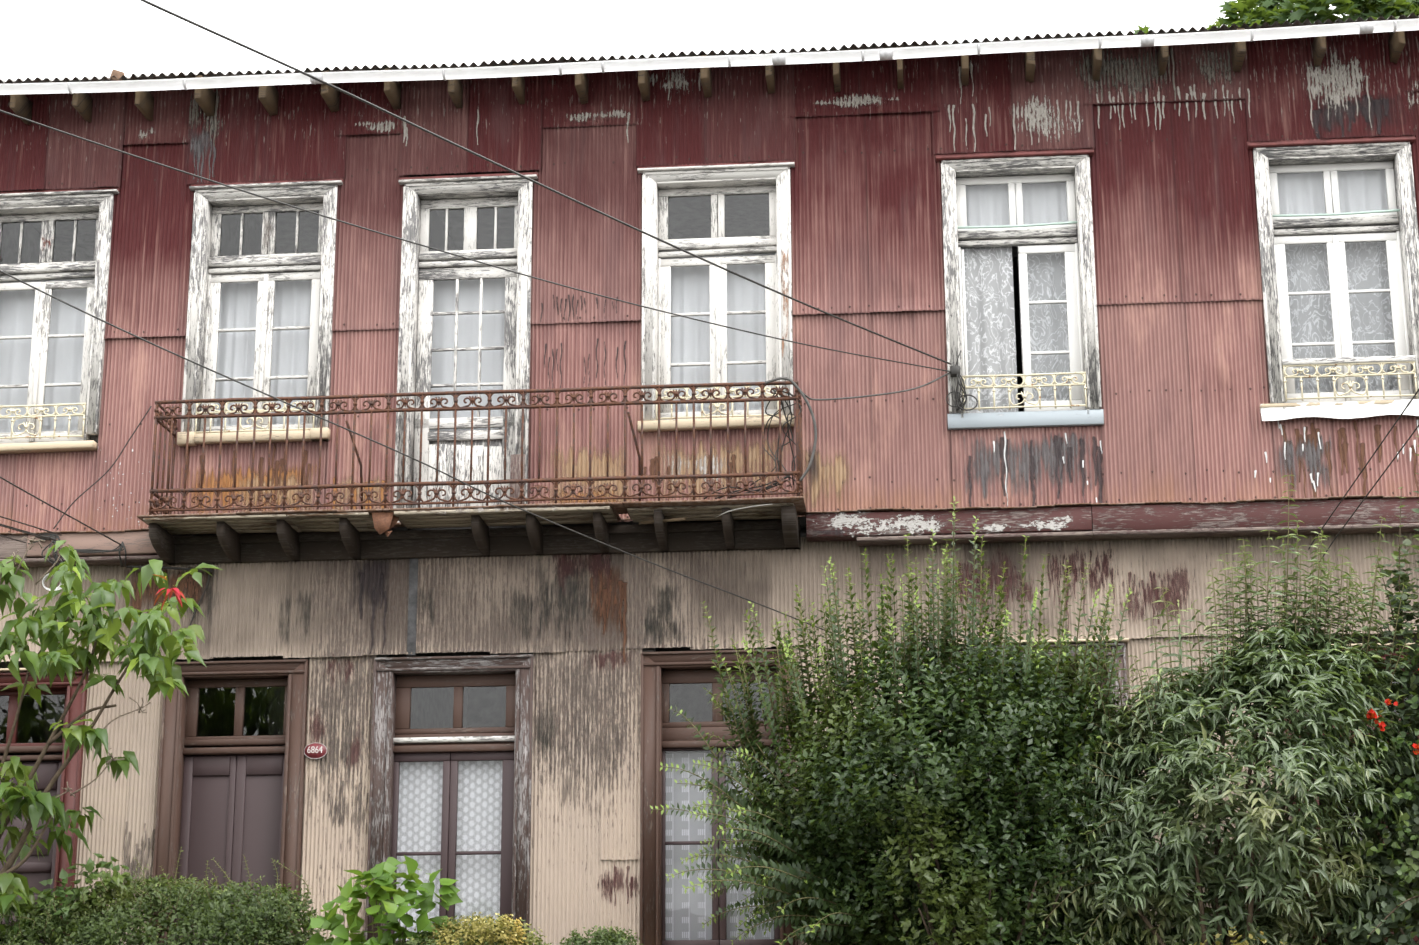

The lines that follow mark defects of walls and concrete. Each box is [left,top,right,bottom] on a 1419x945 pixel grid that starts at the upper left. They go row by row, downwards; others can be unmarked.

peeling [948,60,991,152]
peeling [1012,47,1251,150]
peeling [1303,46,1372,128]
corrosion [550,447,628,503]
corrosion [643,439,775,501]
peeling [813,511,944,535]
damp [279,594,311,641]
damp [357,559,388,658]
damp [513,569,586,636]
damp [645,587,681,643]